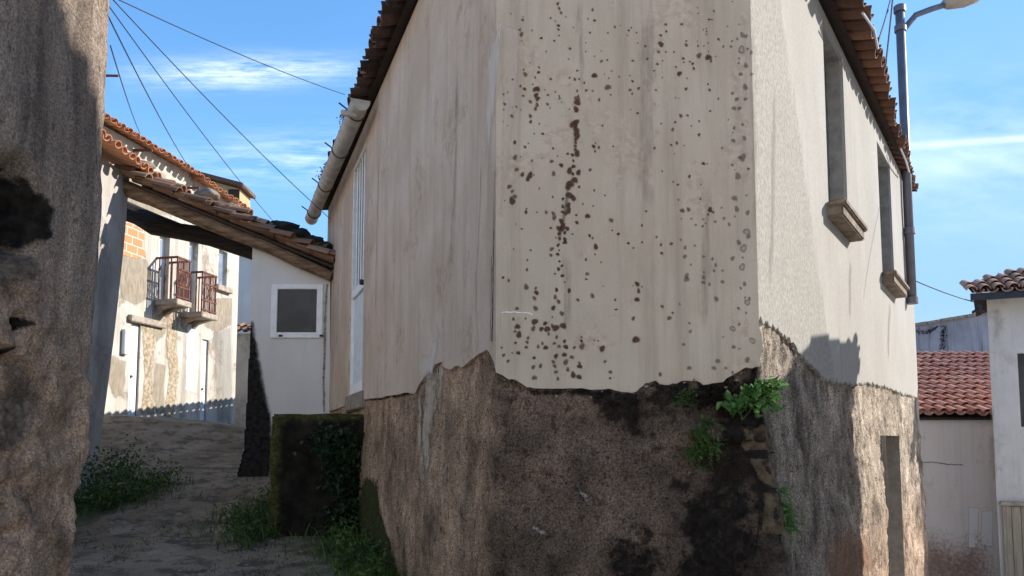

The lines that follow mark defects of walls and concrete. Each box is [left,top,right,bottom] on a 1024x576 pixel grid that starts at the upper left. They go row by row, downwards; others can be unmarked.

leakage [486,2,640,257]
leakage [607,7,753,149]
leakage [672,175,749,227]
leakage [500,284,612,380]
flaking render [504,365,762,400]
leakage [656,230,755,362]
flaking render [740,424,785,535]
leakage [609,532,663,576]